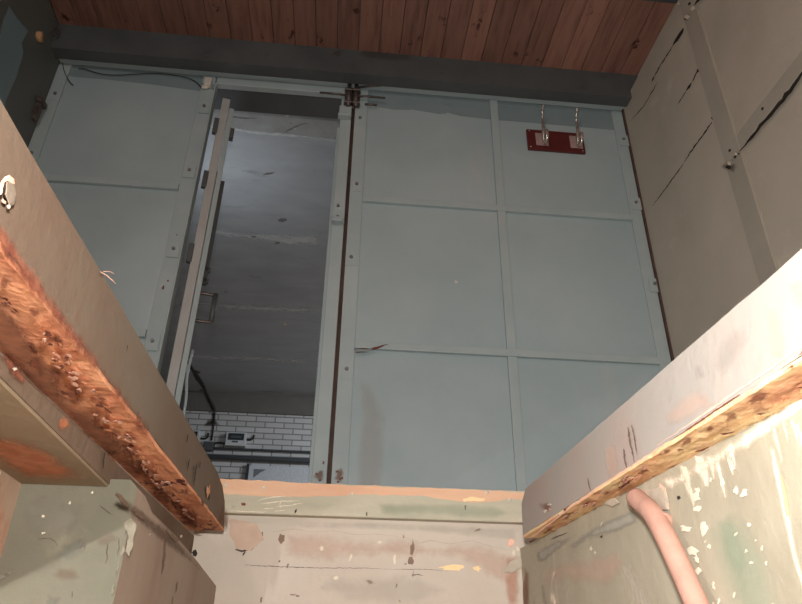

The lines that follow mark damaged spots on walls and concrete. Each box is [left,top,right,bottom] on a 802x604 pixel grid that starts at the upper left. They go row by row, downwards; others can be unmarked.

crack [633,0,699,118]
crack [732,72,802,161]
crack [655,117,713,202]
rust [0,227,98,368]
peeling [41,333,95,394]
rust [0,440,67,478]
peeling [692,487,701,512]
peeling [680,522,711,575]